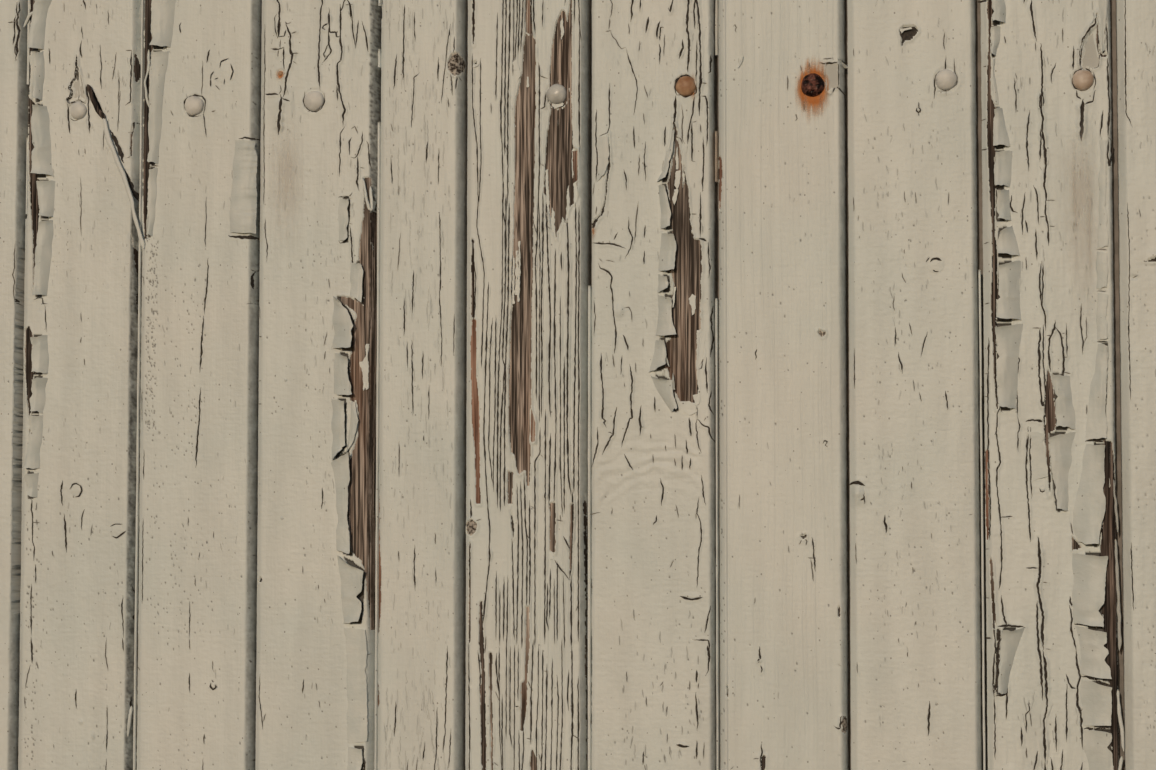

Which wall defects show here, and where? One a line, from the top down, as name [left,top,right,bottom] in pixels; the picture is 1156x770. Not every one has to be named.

peeling [27,0,55,296]
peeling [130,0,176,273]
peeling [331,178,381,770]
crack [195,0,716,770]
peeling [470,239,481,504]
peeling [507,0,578,537]
peeling [649,125,707,415]
rust [797,62,828,112]
crack [934,33,958,97]
peeling [987,0,1023,409]
crack [970,0,1147,770]
peeling [1026,139,1119,770]